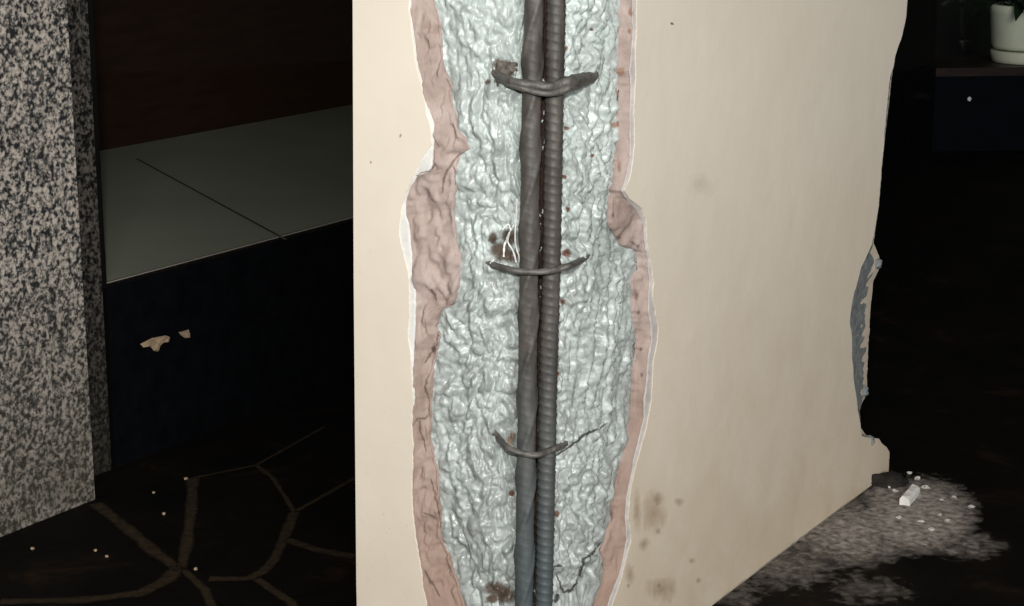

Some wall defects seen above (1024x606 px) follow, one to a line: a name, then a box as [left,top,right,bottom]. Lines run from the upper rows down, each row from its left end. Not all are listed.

corrosion [485,59,518,87]
corrosion [488,230,518,262]
spalling [849,0,908,451]
spalling [400,0,658,606]
corrosion [485,582,513,603]
crack [554,542,601,603]